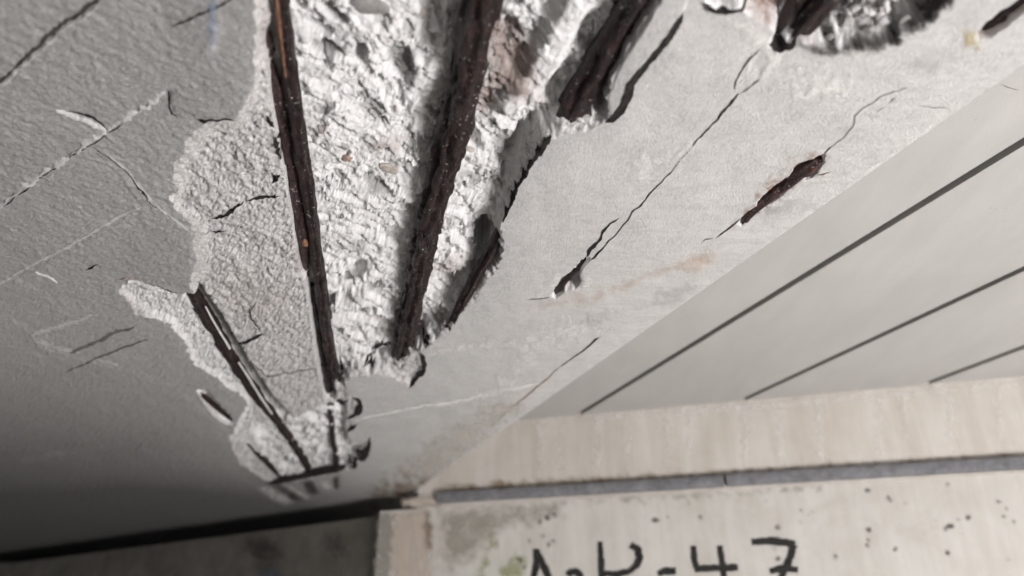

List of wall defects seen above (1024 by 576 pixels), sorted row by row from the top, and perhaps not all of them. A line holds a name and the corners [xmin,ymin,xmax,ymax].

crack [0,0,100,87]
crack [92,147,279,234]
crack [168,91,236,124]
rust [275,0,287,78]
crack [606,13,683,123]
crack [587,51,761,260]
crack [821,88,948,175]
spalling [118,0,688,503]